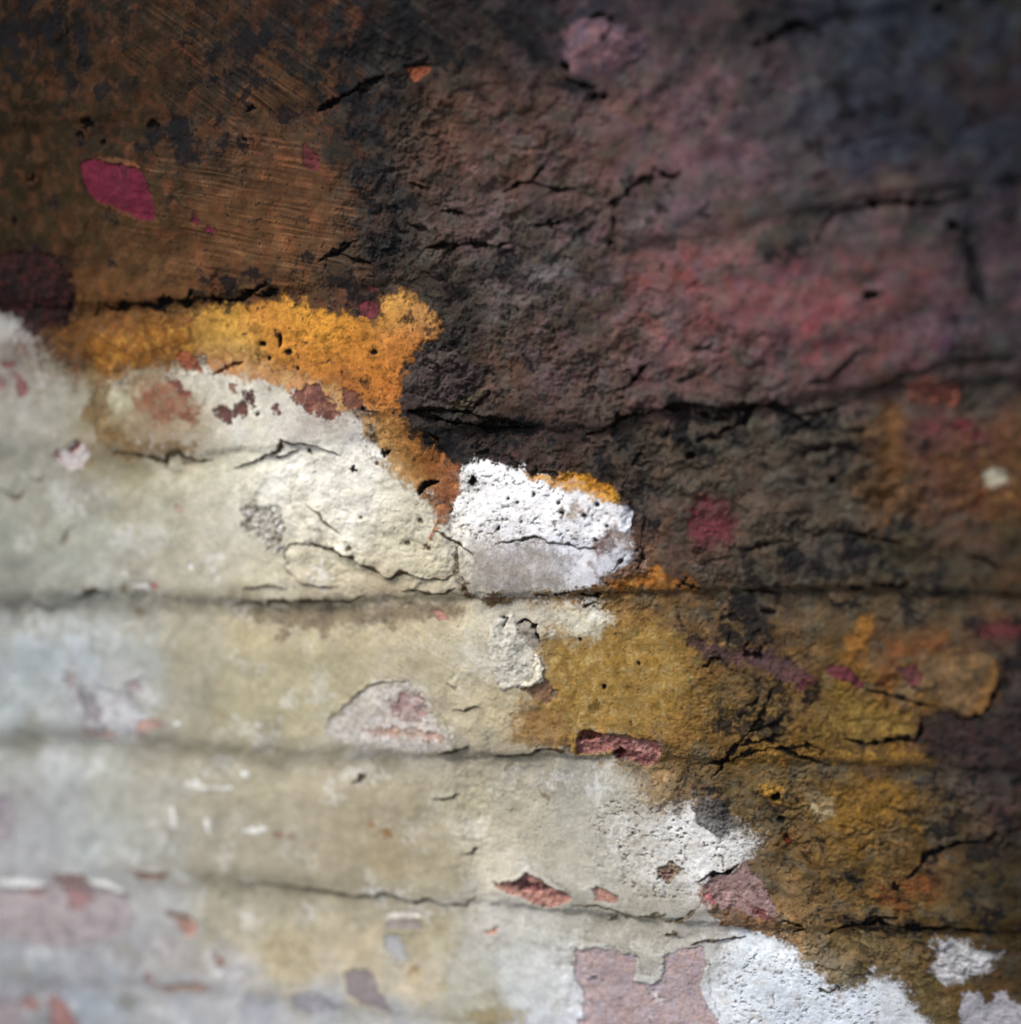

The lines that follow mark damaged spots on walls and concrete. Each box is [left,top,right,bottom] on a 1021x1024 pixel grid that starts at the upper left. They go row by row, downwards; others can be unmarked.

rust [86,287,461,540]
crack [235,439,358,472]
crack [235,506,473,606]
crack [499,521,646,608]
rust [840,614,873,672]
peeling [326,676,457,756]
spalling [577,728,661,765]
rust [730,687,940,908]
spalling [495,863,571,907]
crack [575,864,740,945]
peeling [702,861,776,922]
peeling [572,941,720,1024]